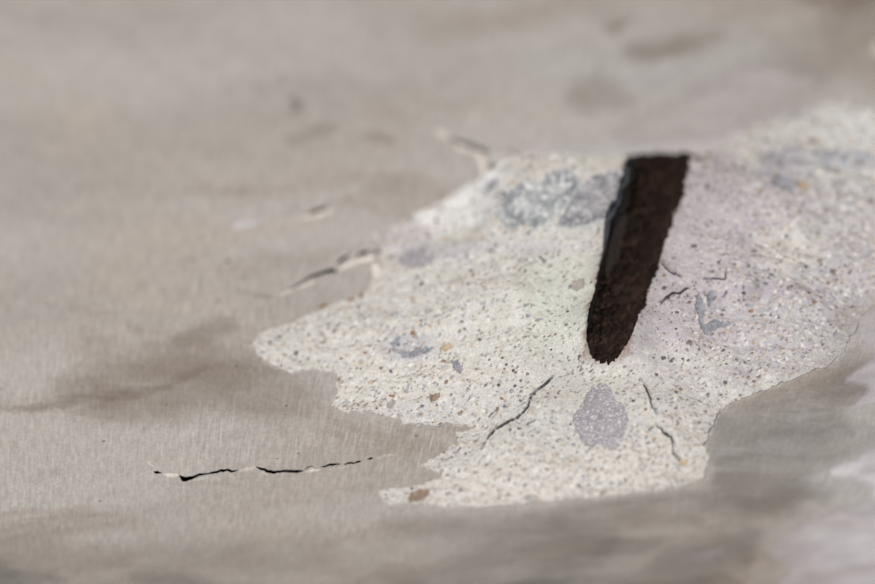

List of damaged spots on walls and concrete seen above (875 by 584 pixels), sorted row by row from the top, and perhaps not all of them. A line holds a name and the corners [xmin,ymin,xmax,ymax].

crack [278,231,382,296]
spalling [249,95,875,509]
corrosion [587,151,694,366]
damp [848,360,875,408]
crack [147,457,373,482]
damp [773,449,875,584]